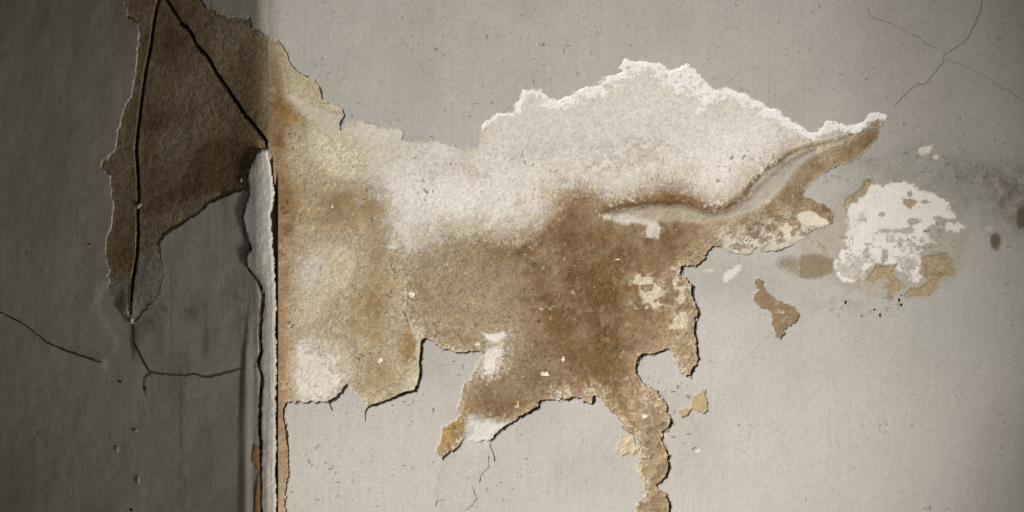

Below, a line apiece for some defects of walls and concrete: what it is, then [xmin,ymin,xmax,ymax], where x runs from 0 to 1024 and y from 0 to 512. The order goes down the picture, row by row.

crack [0,312,102,363]
peeling [102,0,290,512]
damp [103,0,887,512]
flaking render [201,1,968,459]
flaking render [542,383,665,512]
crack [866,4,1022,106]